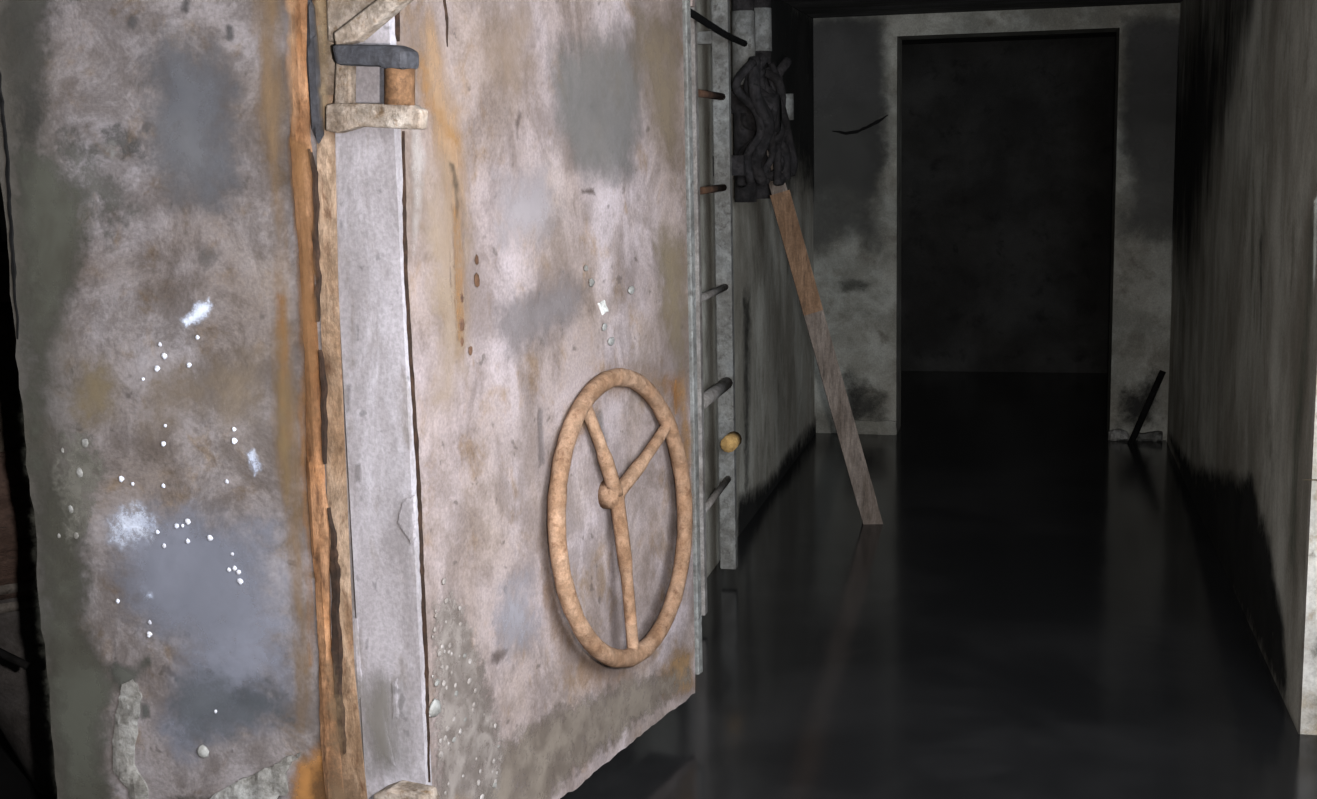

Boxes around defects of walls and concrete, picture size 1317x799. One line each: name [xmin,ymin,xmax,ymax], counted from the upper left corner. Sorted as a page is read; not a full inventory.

corrosion [316,0,328,58]
damp [558,12,680,174]
corrosion [291,141,316,428]
damp [21,40,237,799]
damp [114,508,283,751]
flaking render [112,658,151,799]
spalling [210,752,301,799]